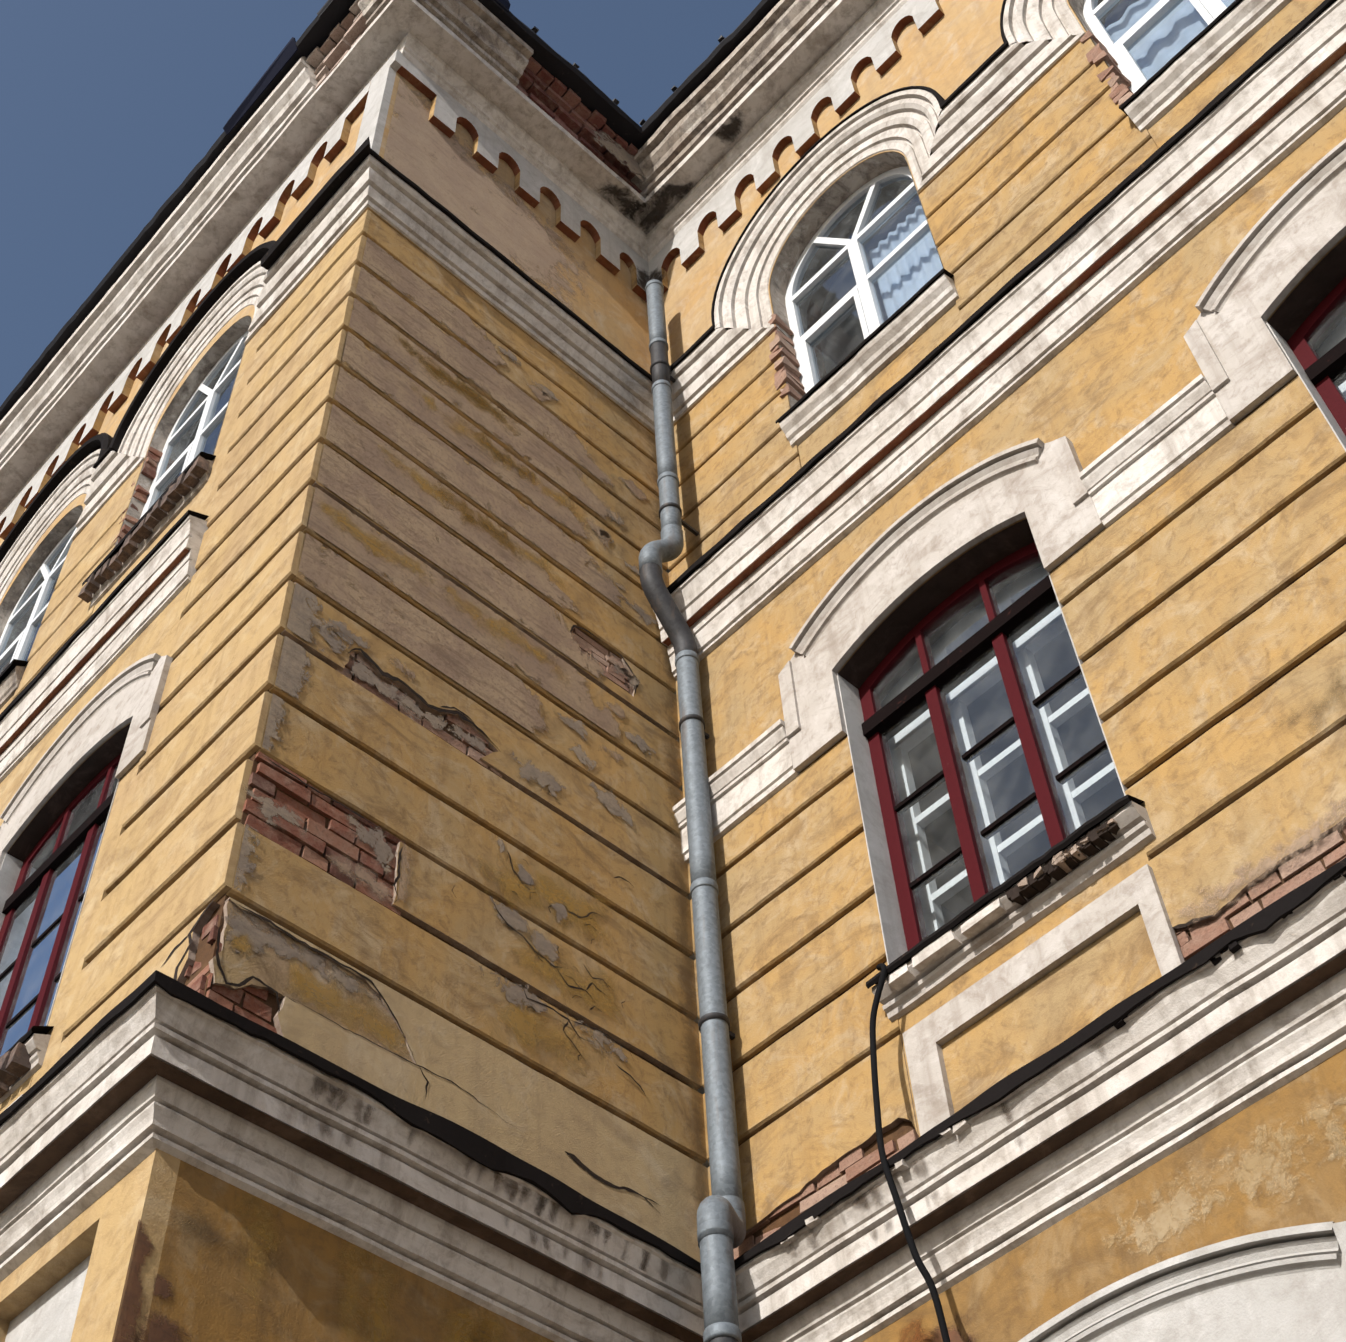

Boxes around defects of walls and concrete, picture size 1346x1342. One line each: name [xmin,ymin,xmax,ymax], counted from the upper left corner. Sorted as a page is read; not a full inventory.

flaking render [161,237,658,1096]
spalling [1172,801,1346,966]
crack [285,995,520,1130]
crack [565,1151,659,1206]
spalling [733,1129,919,1260]
spalling [940,1120,971,1139]